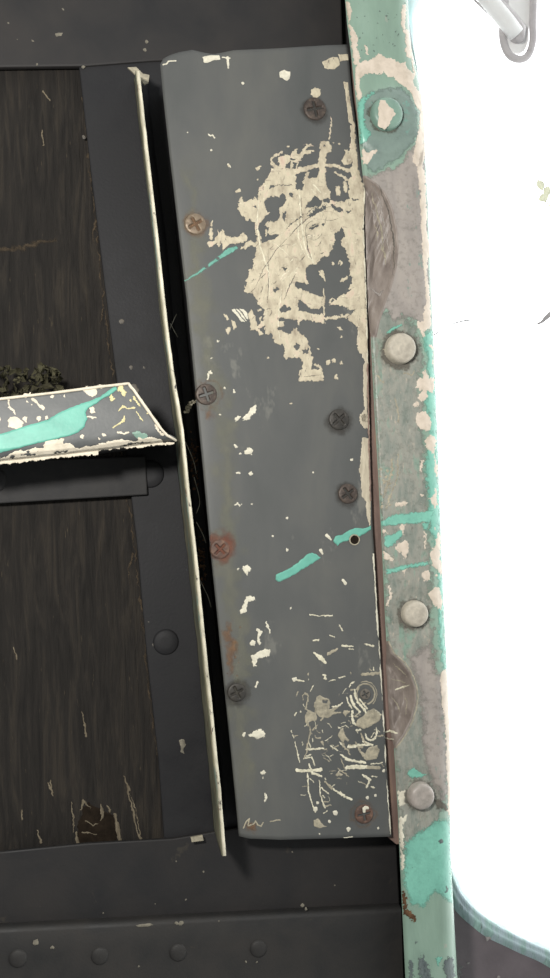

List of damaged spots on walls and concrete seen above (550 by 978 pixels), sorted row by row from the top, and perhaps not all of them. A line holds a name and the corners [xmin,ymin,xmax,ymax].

peeling [0,384,174,464]
peeling [203,2,451,870]
rust [402,891,416,922]